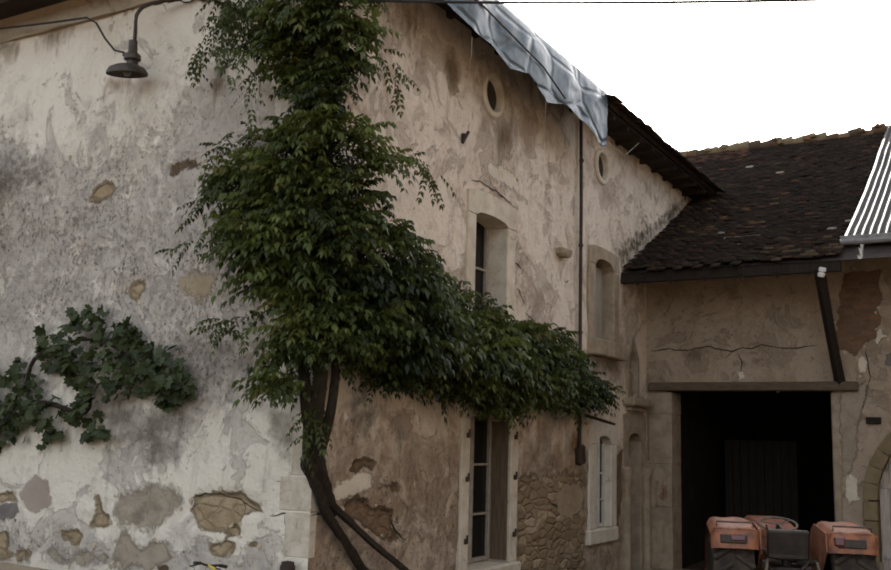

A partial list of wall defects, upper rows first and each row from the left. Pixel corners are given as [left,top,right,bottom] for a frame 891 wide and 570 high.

spalling [166,158,205,176]
spalling [89,167,115,210]
spalling [123,275,145,305]
flaking render [834,267,890,378]
crack [656,344,818,371]
peeling [0,490,17,506]
spalling [333,455,403,542]
peeling [845,474,861,504]
spalling [47,477,263,570]
peeling [0,524,31,562]